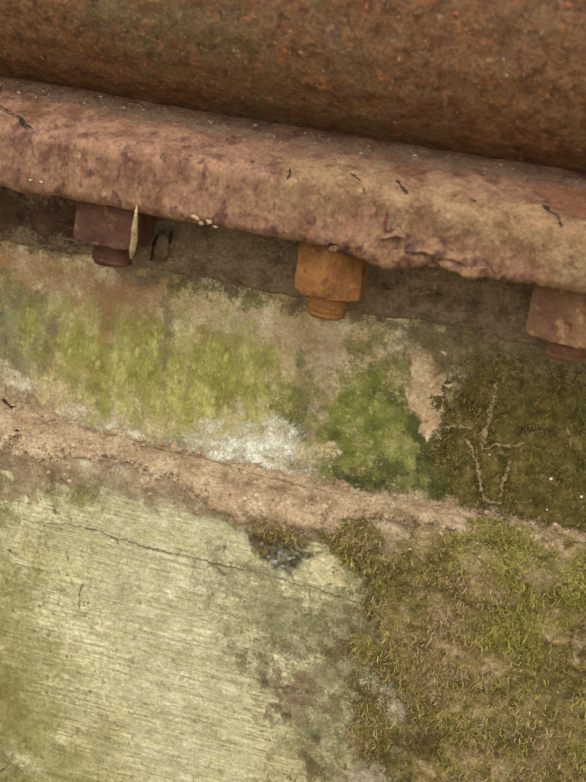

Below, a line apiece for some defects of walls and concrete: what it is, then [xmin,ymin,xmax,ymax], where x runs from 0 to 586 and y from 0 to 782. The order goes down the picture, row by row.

crack [0,86,33,129]
leakage [0,365,314,476]
crack [34,521,364,606]